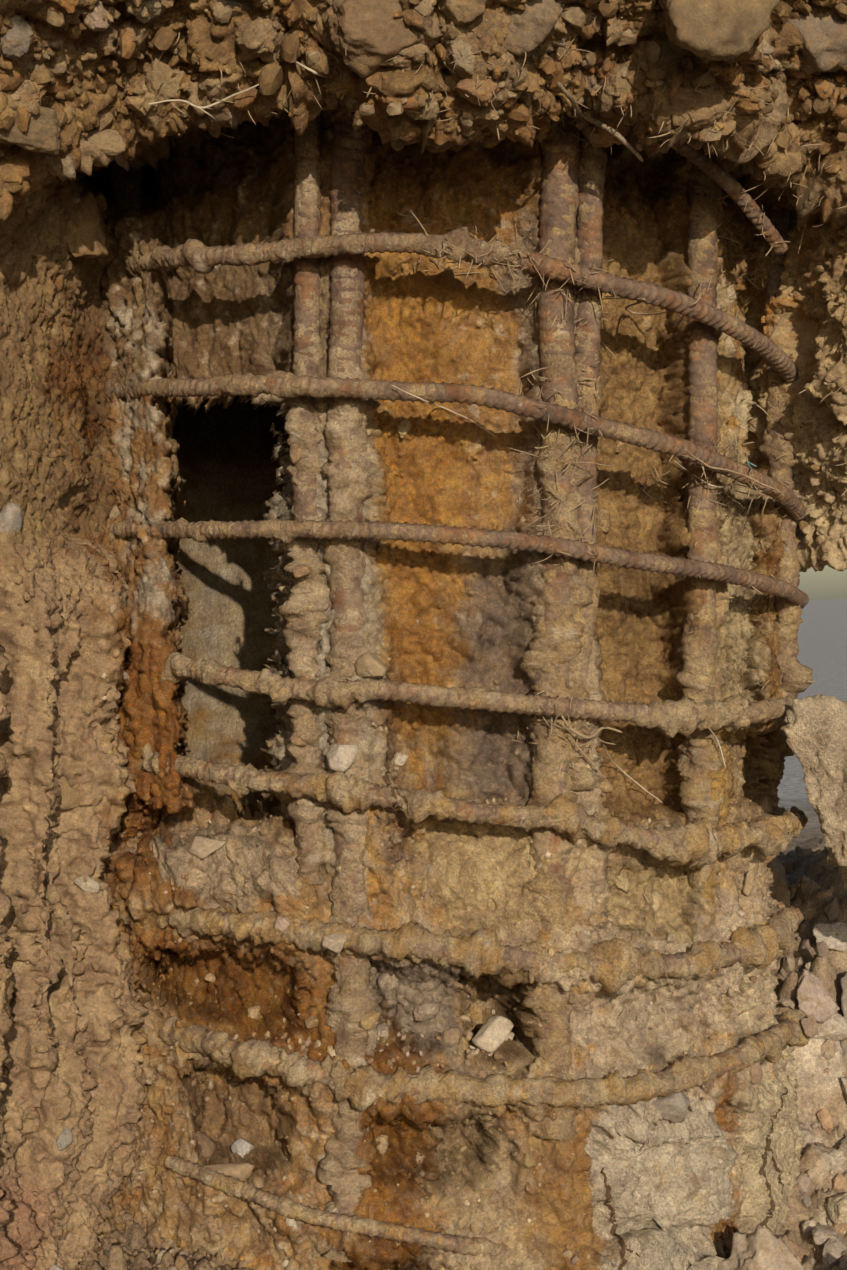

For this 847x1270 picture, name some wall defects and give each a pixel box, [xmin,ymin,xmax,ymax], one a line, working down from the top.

spalling [602,144,682,292]
corrosion [369,258,450,383]
spalling [599,293,689,438]
corrosion [377,400,459,525]
spalling [596,436,691,558]
corrosion [388,540,451,686]
spalling [594,562,704,704]
corrosion [104,606,349,1069]
spalling [596,720,687,820]
spalling [370,960,543,1061]
corrosion [355,1094,442,1225]
crack [759,1088,788,1232]